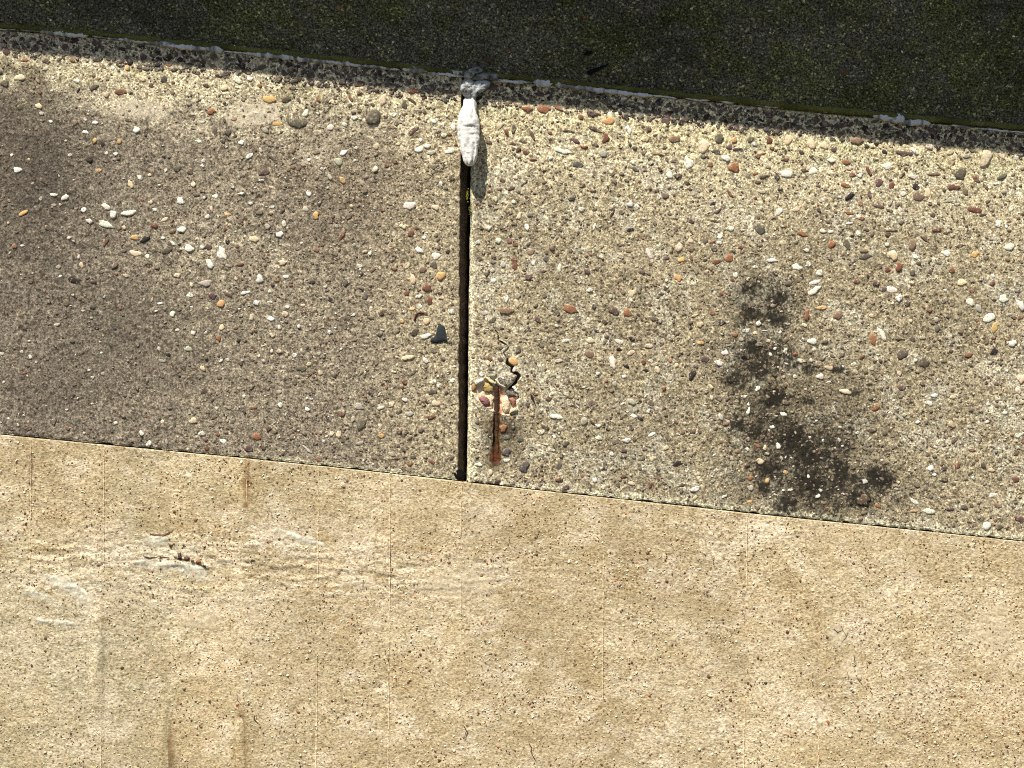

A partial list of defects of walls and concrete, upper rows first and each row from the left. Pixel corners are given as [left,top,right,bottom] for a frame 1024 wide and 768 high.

corrosion [490,411,500,466]
crack [495,330,521,398]
spalling [471,81,1024,534]
mould [718,264,902,519]